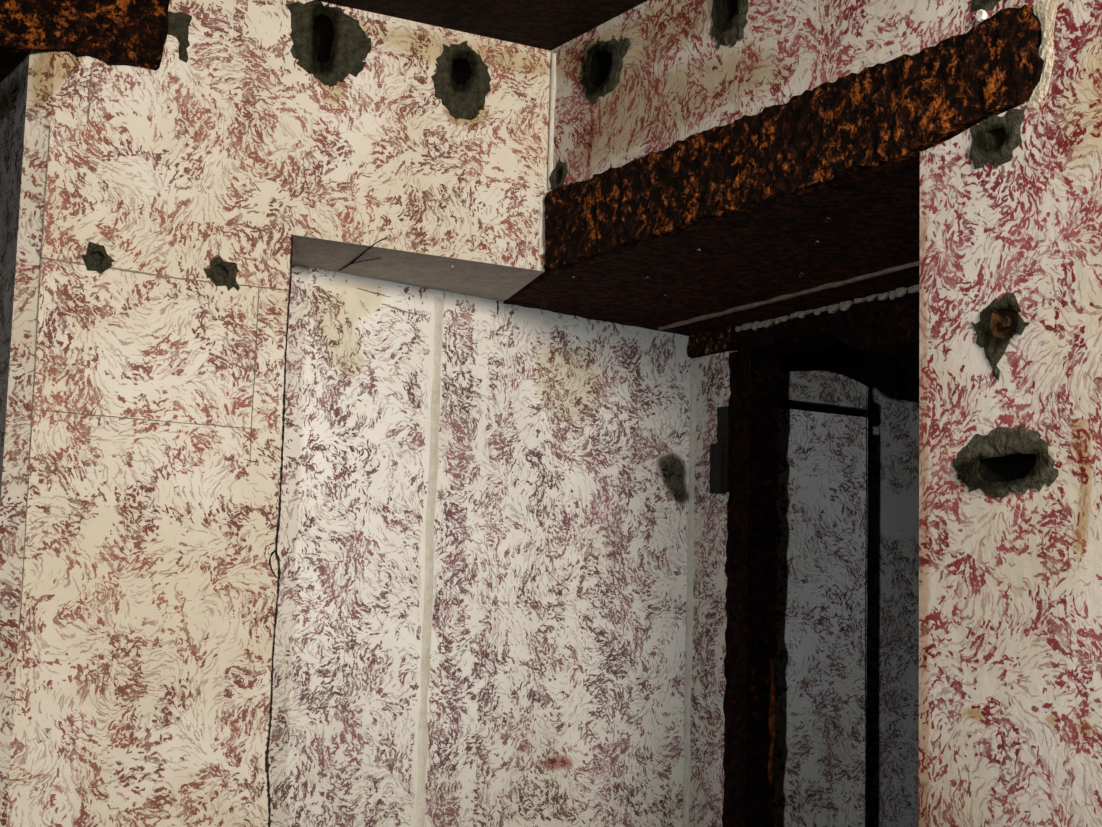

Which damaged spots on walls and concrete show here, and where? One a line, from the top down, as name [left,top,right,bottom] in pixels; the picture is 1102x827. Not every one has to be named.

crack [19,128,293,827]
corrosion [586,98,601,173]